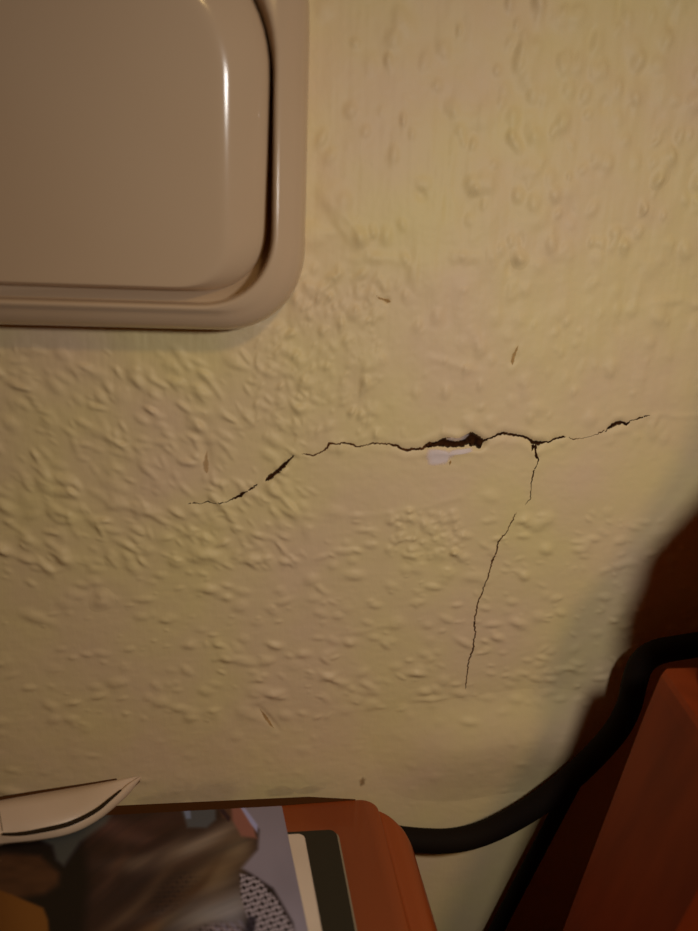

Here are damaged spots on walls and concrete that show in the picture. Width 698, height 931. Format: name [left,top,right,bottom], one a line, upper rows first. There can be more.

crack [189,415,650,689]